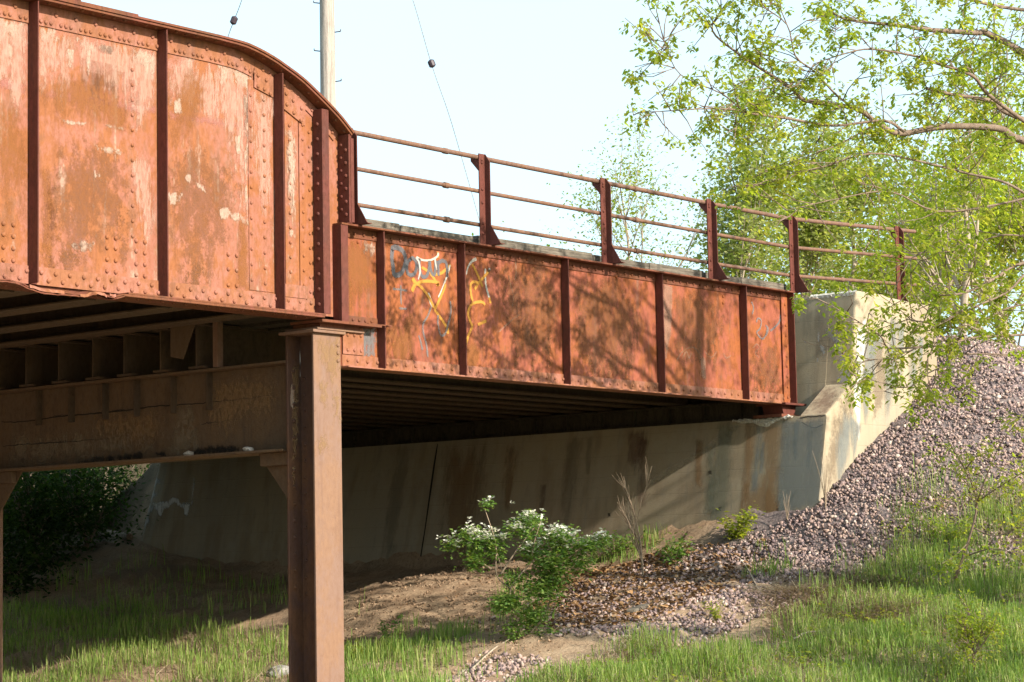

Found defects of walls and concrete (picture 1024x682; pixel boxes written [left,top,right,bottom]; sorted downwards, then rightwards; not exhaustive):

rust [45,74,125,127]
peeling [40,28,155,127]
rust [177,75,202,127]
rust [43,174,54,268]
peeling [133,160,151,241]
peeling [170,58,274,224]
peeling [287,132,297,208]
rust [348,243,373,314]
rust [363,328,375,357]